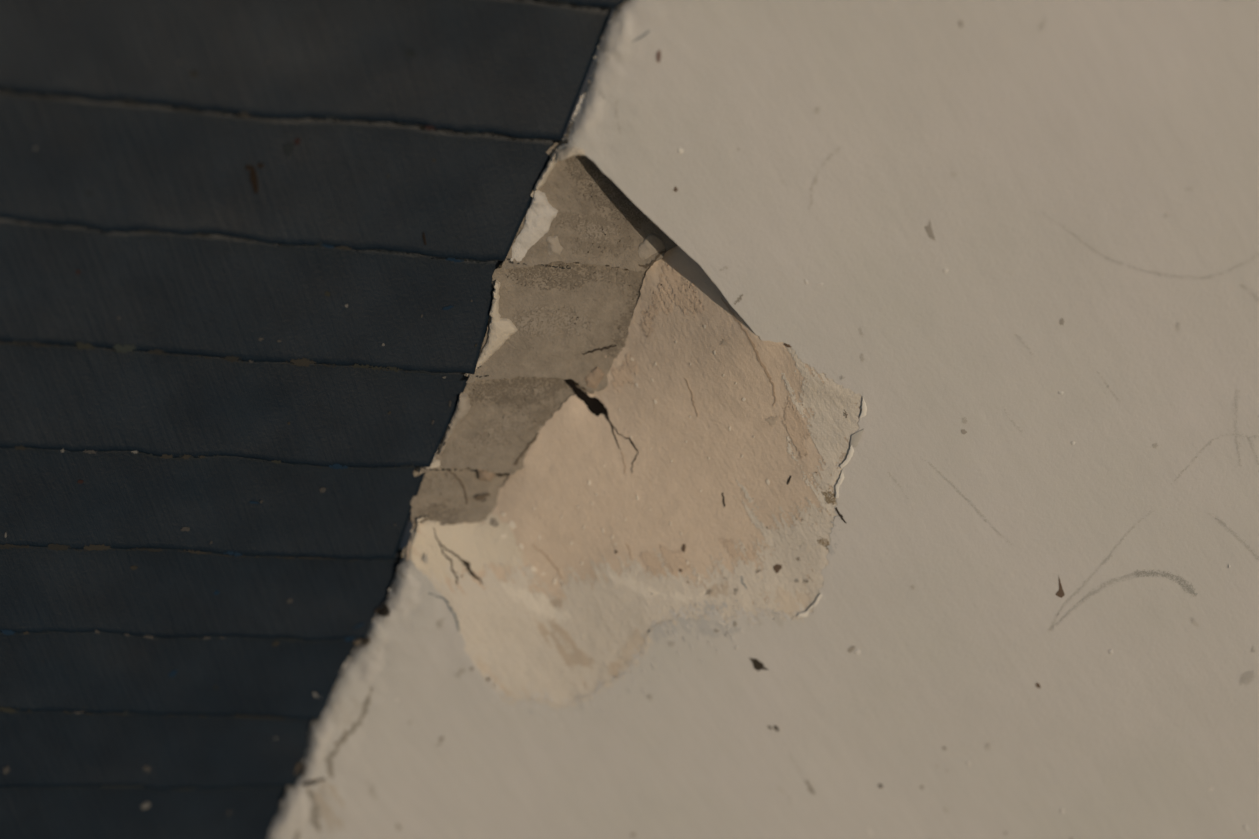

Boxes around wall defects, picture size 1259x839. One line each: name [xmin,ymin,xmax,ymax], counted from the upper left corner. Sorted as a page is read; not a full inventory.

spalling [268,0,867,839]